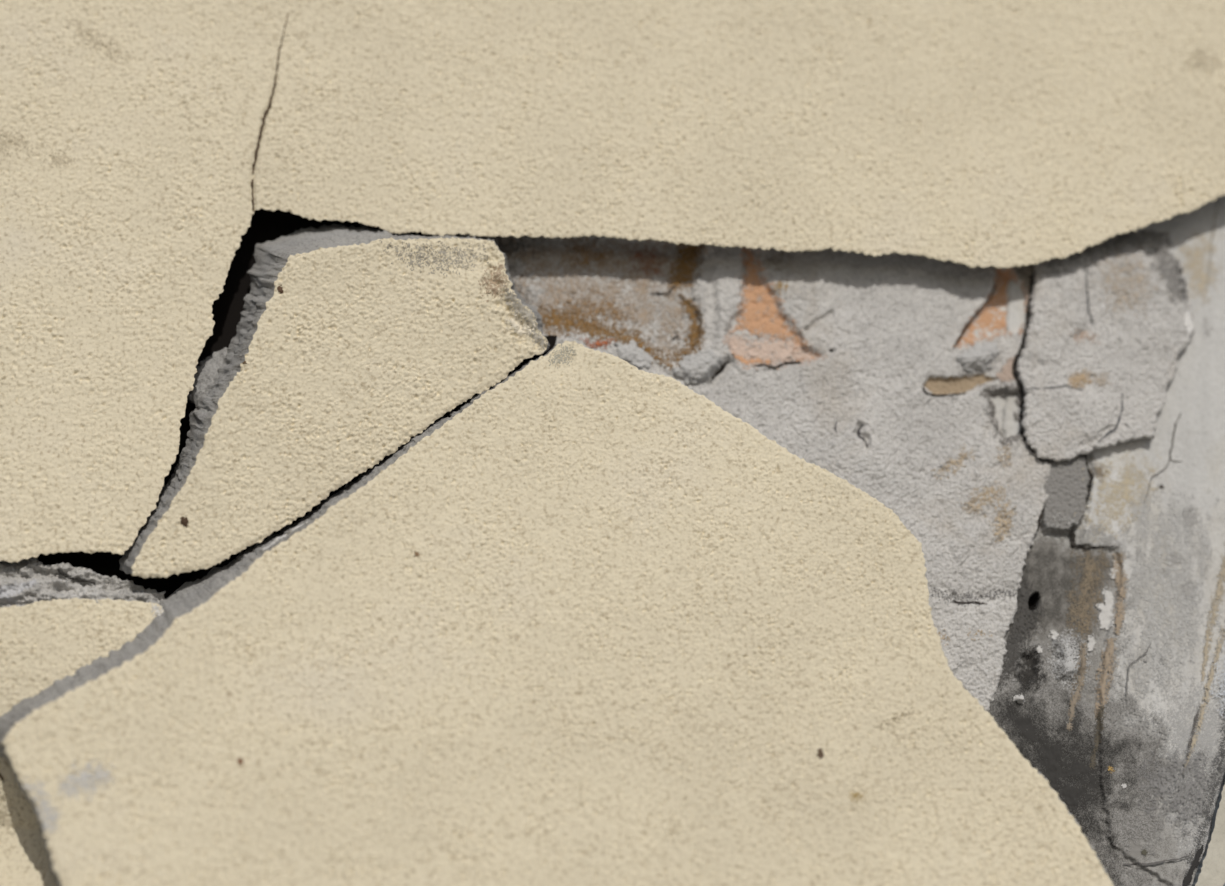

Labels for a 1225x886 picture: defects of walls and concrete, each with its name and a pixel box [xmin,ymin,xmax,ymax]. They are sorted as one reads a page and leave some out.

crack [196,1,438,366]
flaking render [722,246,828,370]
flaking render [952,267,1029,348]
crack [444,335,557,416]
crack [163,400,196,487]
crack [31,456,386,598]
spalling [0,343,563,886]
leakage [930,443,1225,886]
peeling [1087,560,1120,652]